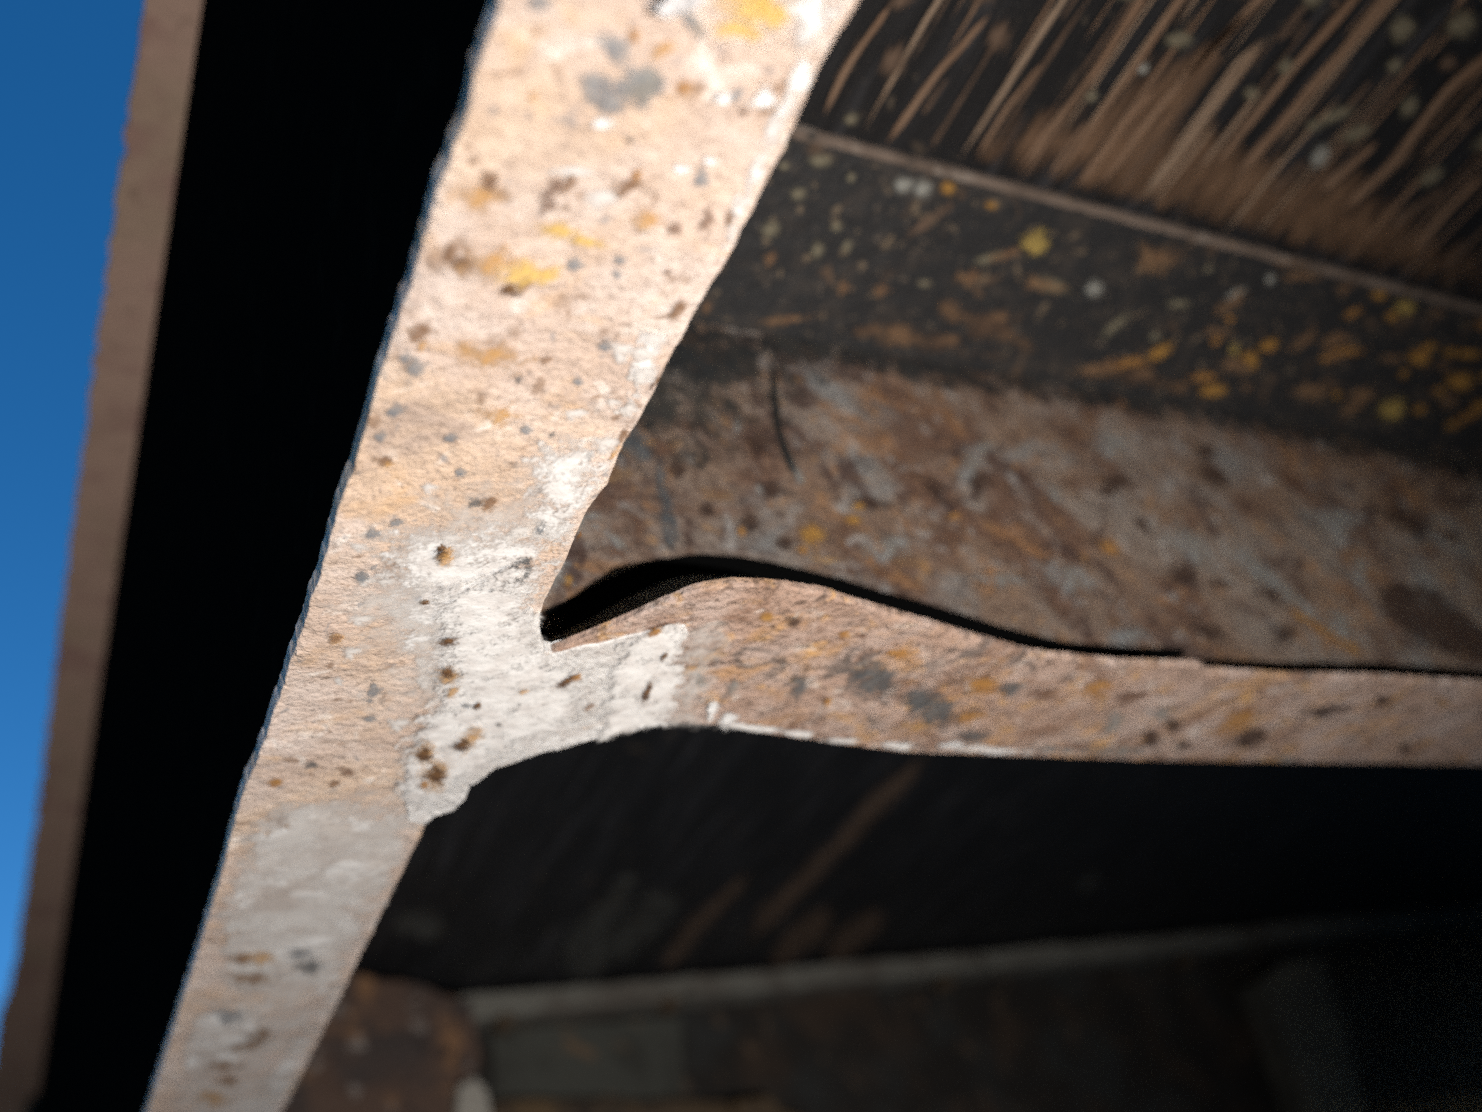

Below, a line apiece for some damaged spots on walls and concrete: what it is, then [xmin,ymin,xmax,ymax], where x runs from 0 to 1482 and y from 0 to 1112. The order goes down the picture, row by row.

corrosion [608,466,634,483]
crack [539,553,1482,680]
corrosion [707,700,719,722]